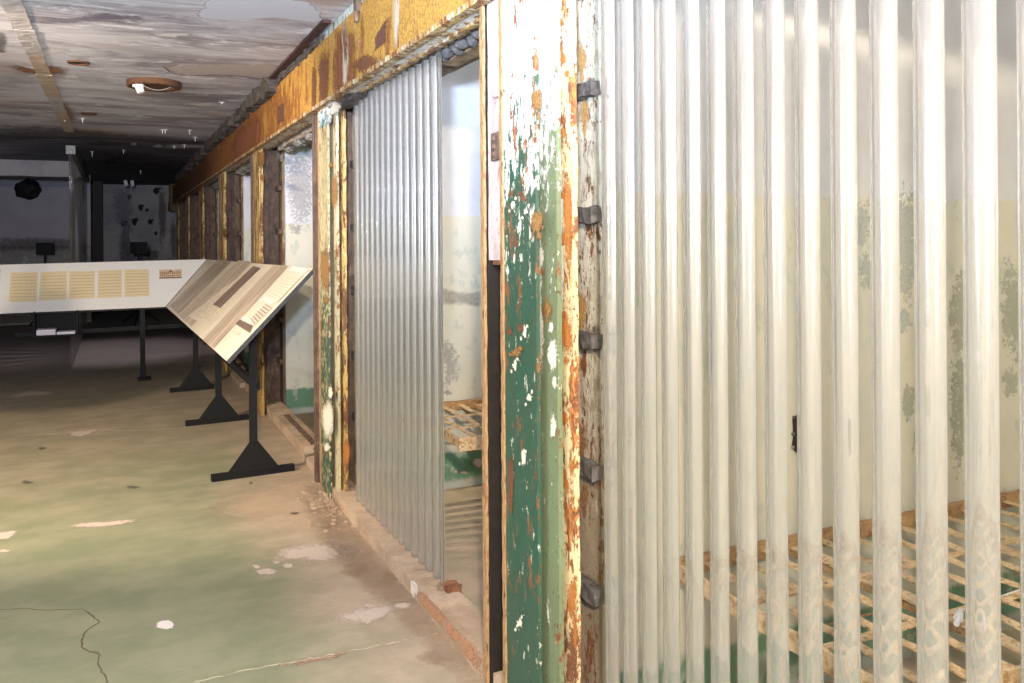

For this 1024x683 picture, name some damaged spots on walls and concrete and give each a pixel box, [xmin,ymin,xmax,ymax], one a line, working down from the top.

corrosion [311,21,386,114]
corrosion [560,44,586,83]
peeling [520,144,564,388]
corrosion [561,170,573,279]
leakage [899,182,914,333]
peeling [321,387,334,452]
corrosion [542,294,587,377]
leakage [949,272,964,480]
leakage [1000,257,1018,398]
peeling [251,542,356,575]
crack [0,608,108,683]
spalling [337,580,484,677]